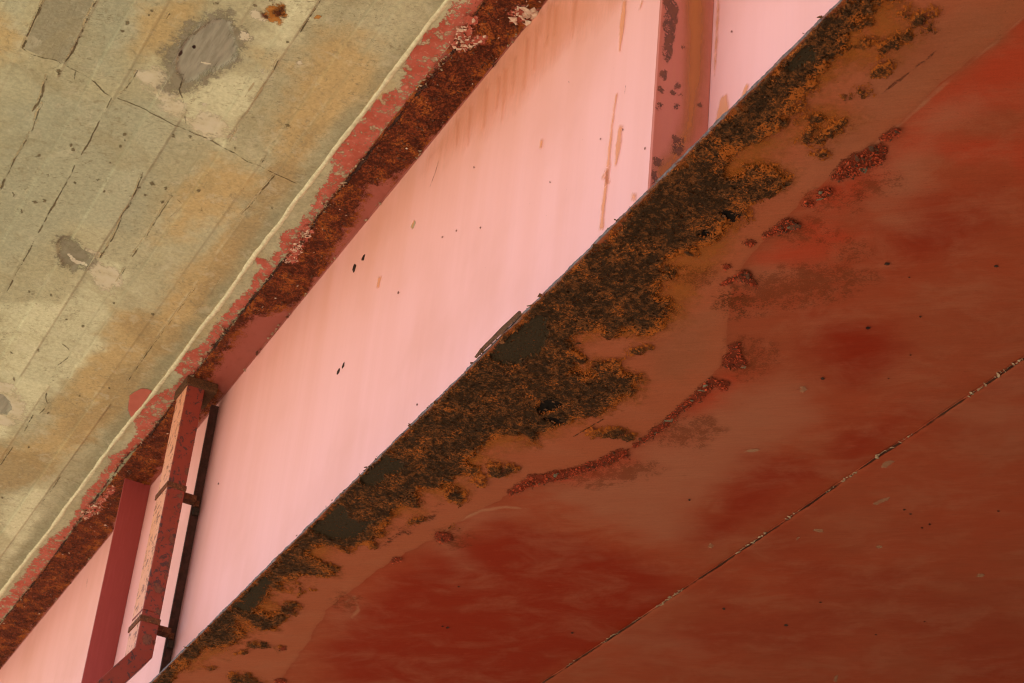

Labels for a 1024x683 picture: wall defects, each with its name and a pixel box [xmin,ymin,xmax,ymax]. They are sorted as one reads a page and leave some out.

corrosion [0,400,176,668]
crack [0,0,485,623]
peeling [0,0,488,622]
corrosion [153,0,943,683]